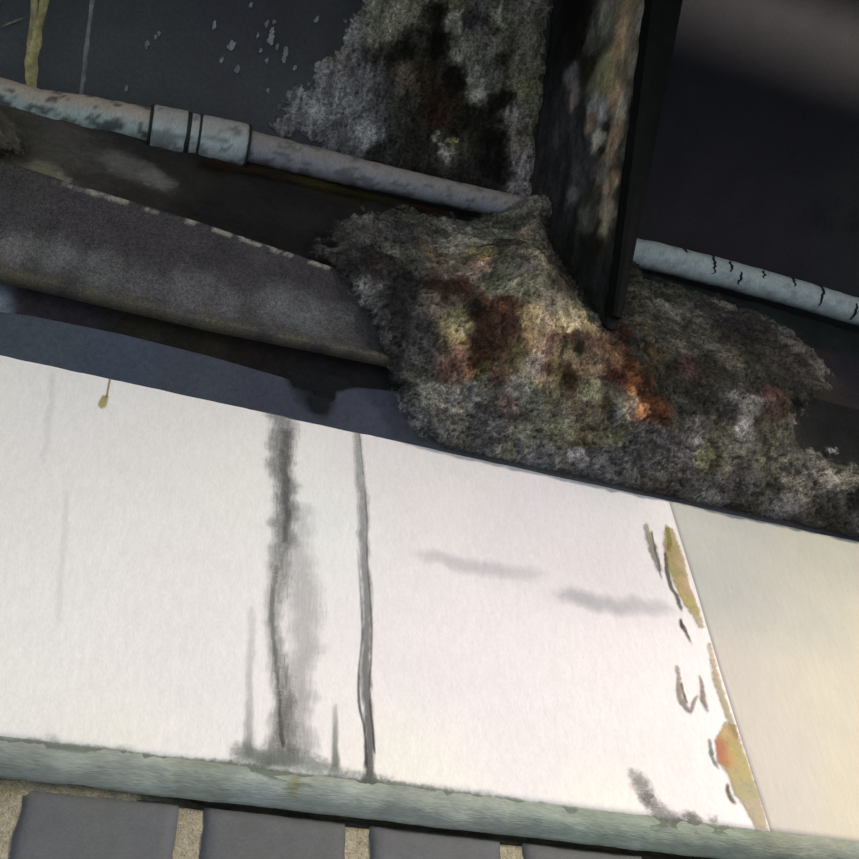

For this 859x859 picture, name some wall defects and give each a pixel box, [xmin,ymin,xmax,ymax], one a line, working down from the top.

leakage [5,0,49,88]
leakage [79,0,95,94]
leakage [268,0,554,197]
crack [711,255,767,285]
leakage [287,369,354,414]
rust [309,188,859,538]
leakage [269,413,296,563]
leakage [180,446,448,794]
peeling [645,525,691,641]
peeling [676,666,708,712]
leakage [0,738,123,753]